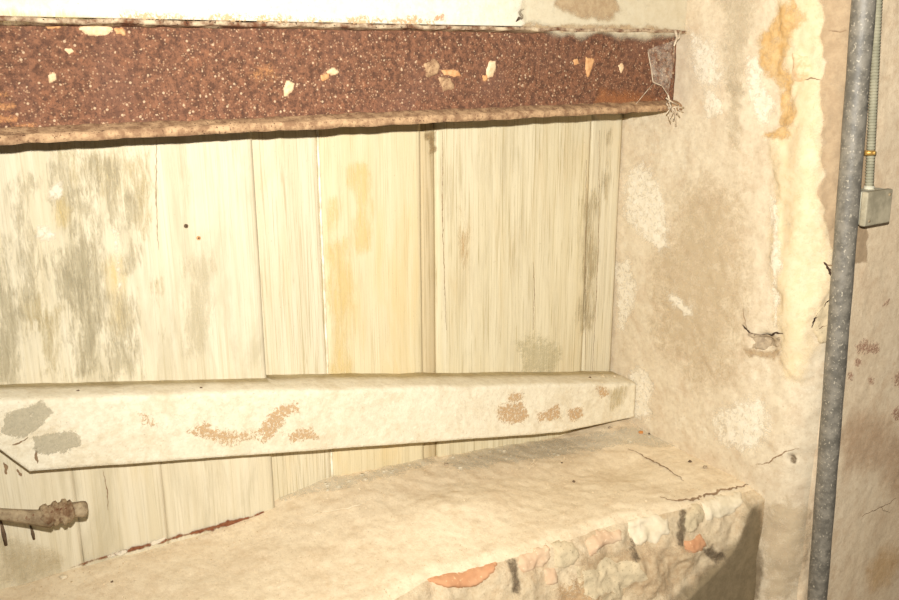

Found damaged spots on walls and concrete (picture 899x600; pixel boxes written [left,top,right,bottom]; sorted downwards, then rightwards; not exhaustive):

leakage [746,0,801,139]
mould [56,230,138,376]
peeling [1,400,81,455]
crack [629,449,748,501]
crack [761,449,797,465]